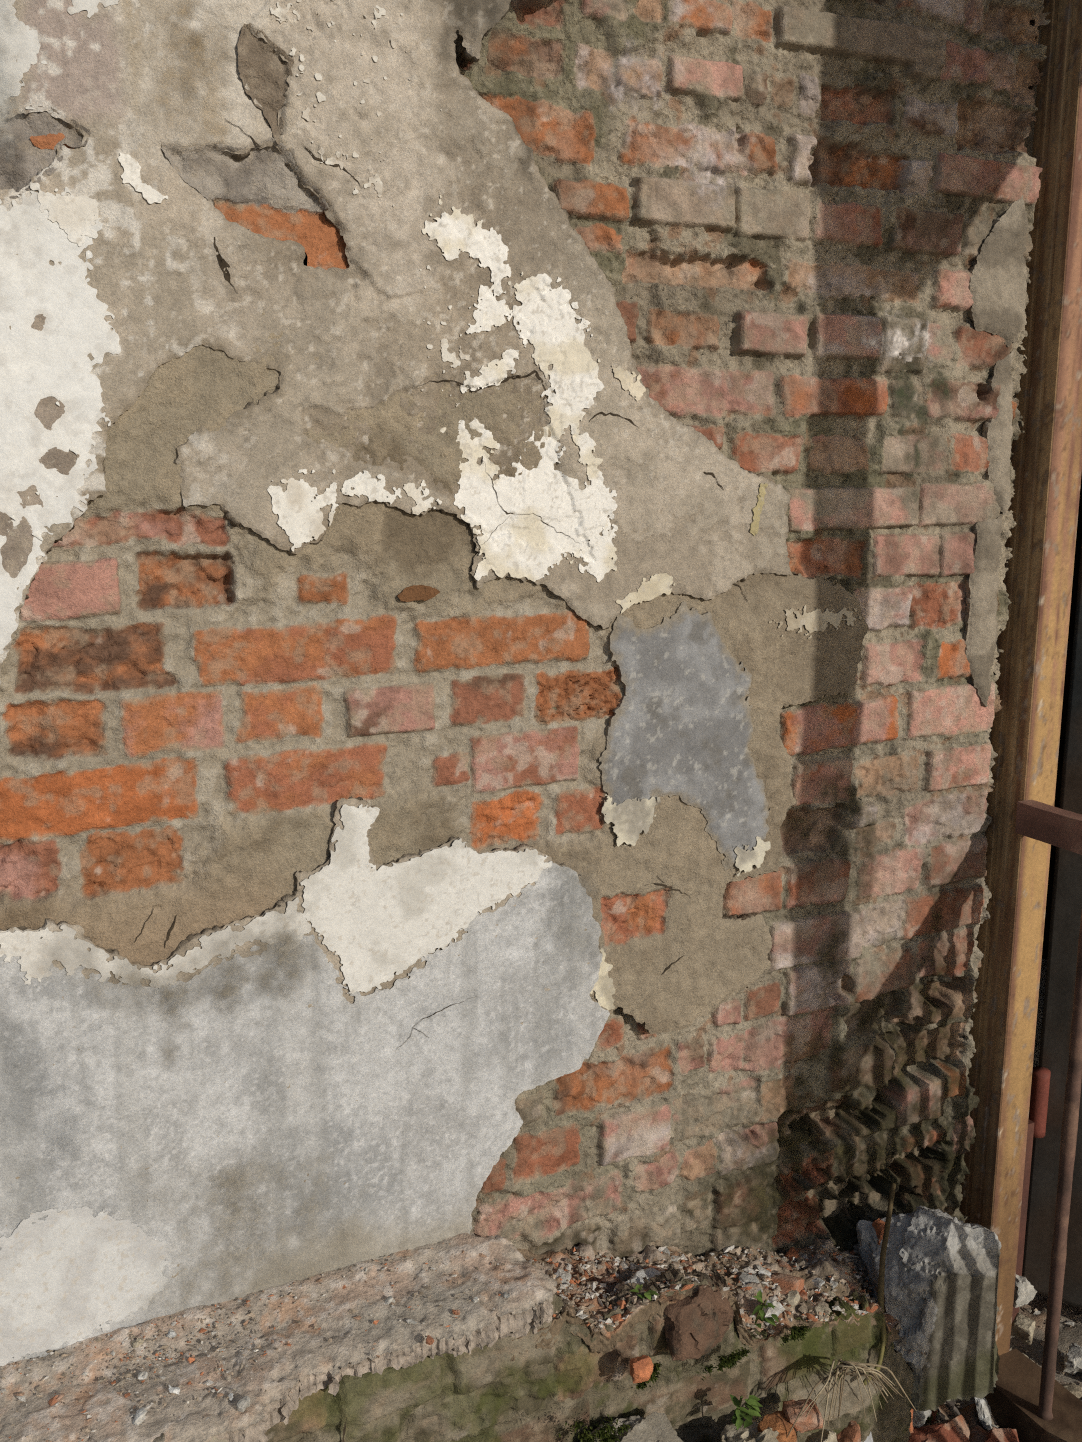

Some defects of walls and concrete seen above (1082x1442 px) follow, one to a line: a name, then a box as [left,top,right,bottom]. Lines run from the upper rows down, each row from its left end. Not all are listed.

peeling [34,396,65,431]
peeling [39,442,80,475]
flaking render [489,440,517,481]
peeling [17,485,44,509]
peeling [0,511,16,538]
flaking render [469,523,501,589]
spalling [397,585,440,602]
peeling [785,605,856,633]
peeling [601,794,656,846]
peeling [734,836,771,876]
peeling [300,796,552,1004]
flaking render [0,852,331,989]